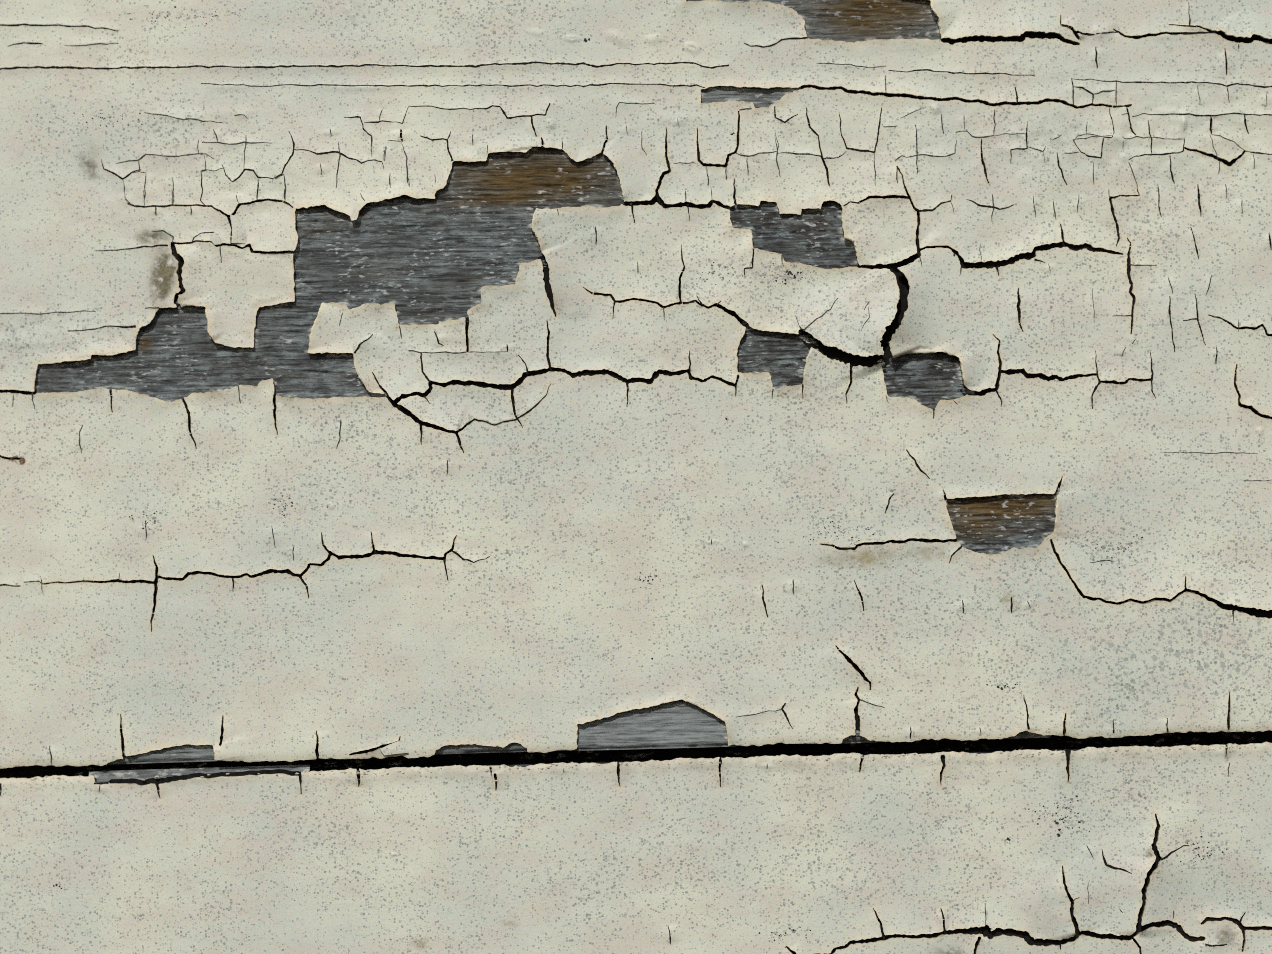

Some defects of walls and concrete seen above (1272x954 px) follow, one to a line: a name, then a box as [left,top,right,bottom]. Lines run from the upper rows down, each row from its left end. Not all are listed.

peeling [719,0,949,43]
crack [0,2,1272,419]
peeling [31,142,1009,431]
crack [339,255,738,473]
crack [182,399,197,449]
peeling [945,487,1060,554]
crack [0,523,490,632]
crack [1050,539,1272,622]
peeling [89,744,421,782]
peeling [380,741,408,755]
peeling [435,699,736,772]
crack [786,814,1272,954]